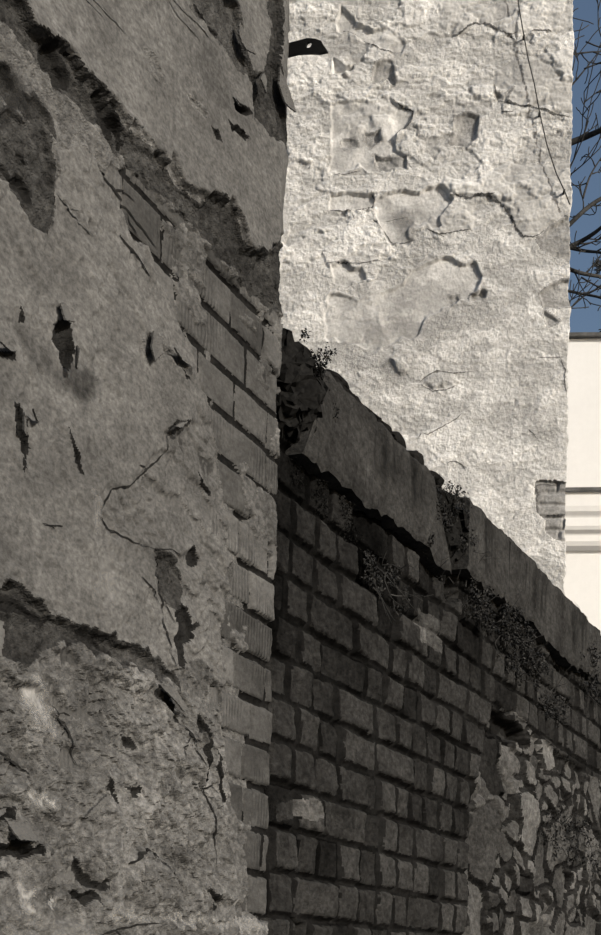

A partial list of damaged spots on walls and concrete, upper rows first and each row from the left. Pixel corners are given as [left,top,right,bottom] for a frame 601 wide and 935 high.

crack [451,22,551,39]
flaking render [0,0,296,316]
flaking render [448,111,482,147]
crack [494,84,571,117]
crack [450,192,544,238]
flaking render [321,253,489,351]
flaking render [51,303,80,372]
flaking render [14,401,43,472]
crack [98,434,180,669]
flaking render [0,578,200,712]
flaking render [0,806,46,860]
flaking render [68,856,112,907]